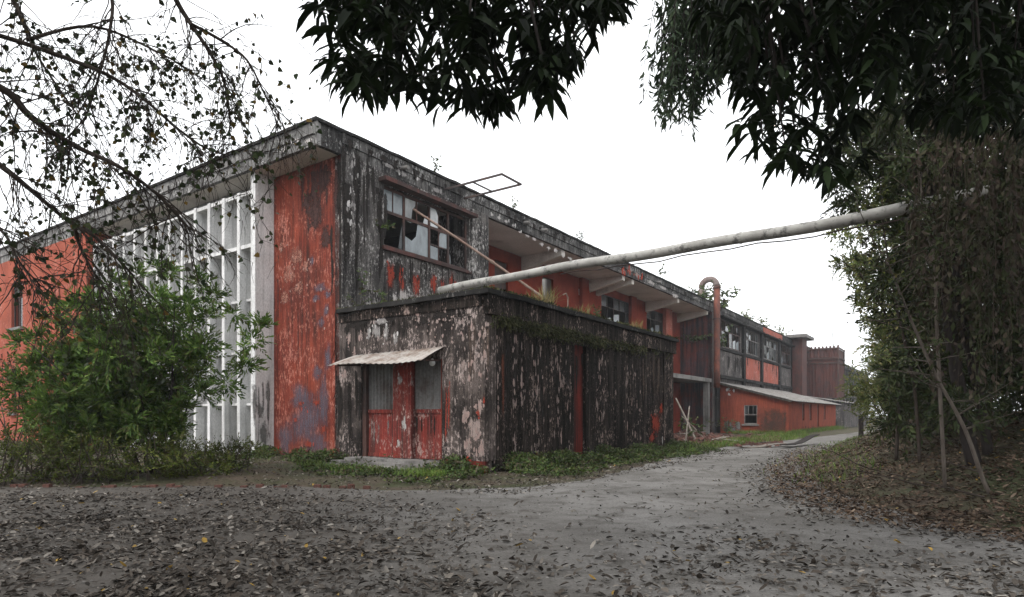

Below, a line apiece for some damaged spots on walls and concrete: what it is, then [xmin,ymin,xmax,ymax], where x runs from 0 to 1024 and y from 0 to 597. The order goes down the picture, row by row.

water stain [301,138,427,308]
peeling [279,243,330,330]
peeling [278,347,331,453]
peeling [346,317,398,356]
peeling [387,260,456,301]
spalling [415,310,571,463]
water stain [468,319,660,441]